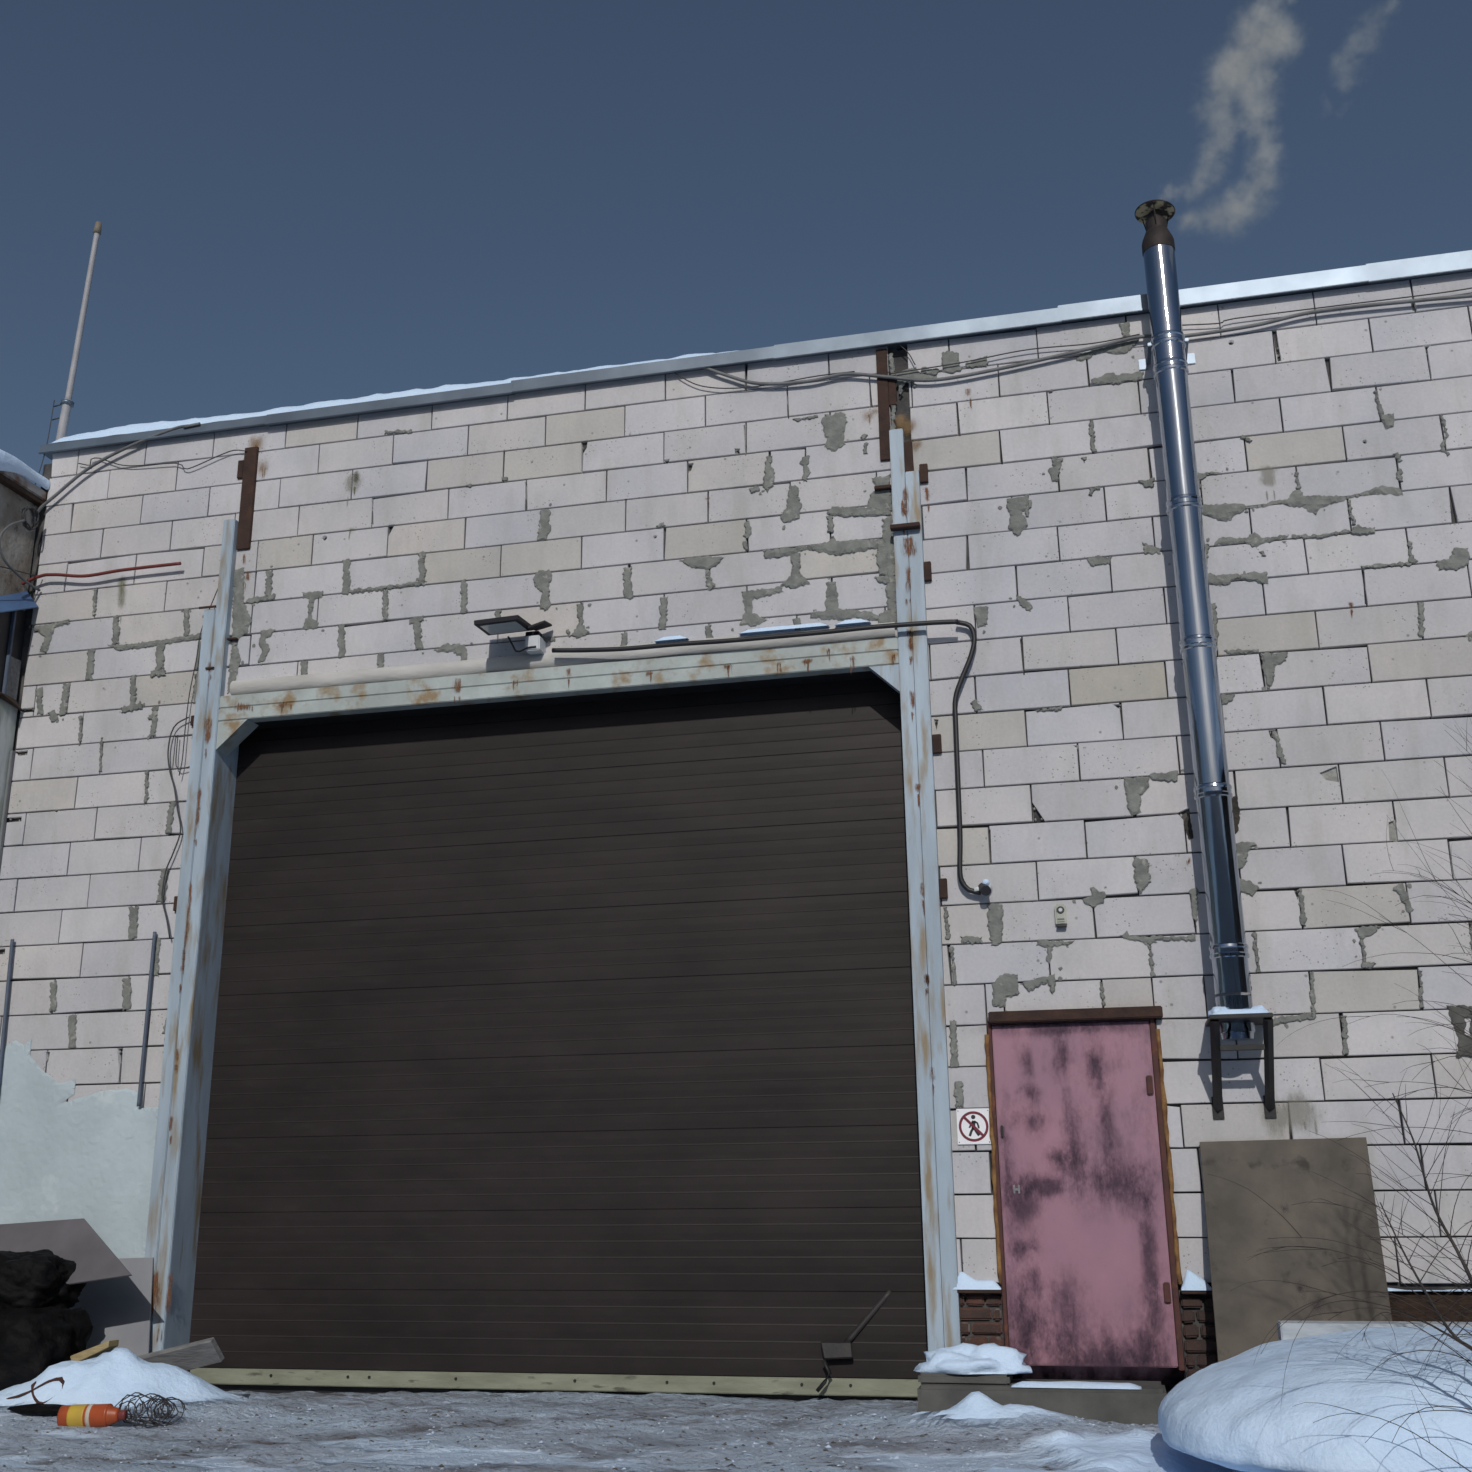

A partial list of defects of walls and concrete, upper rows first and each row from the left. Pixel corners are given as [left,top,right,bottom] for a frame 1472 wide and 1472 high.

rust [901,489,915,604]
rust [179,884,192,992]
rust [151,1273,173,1340]